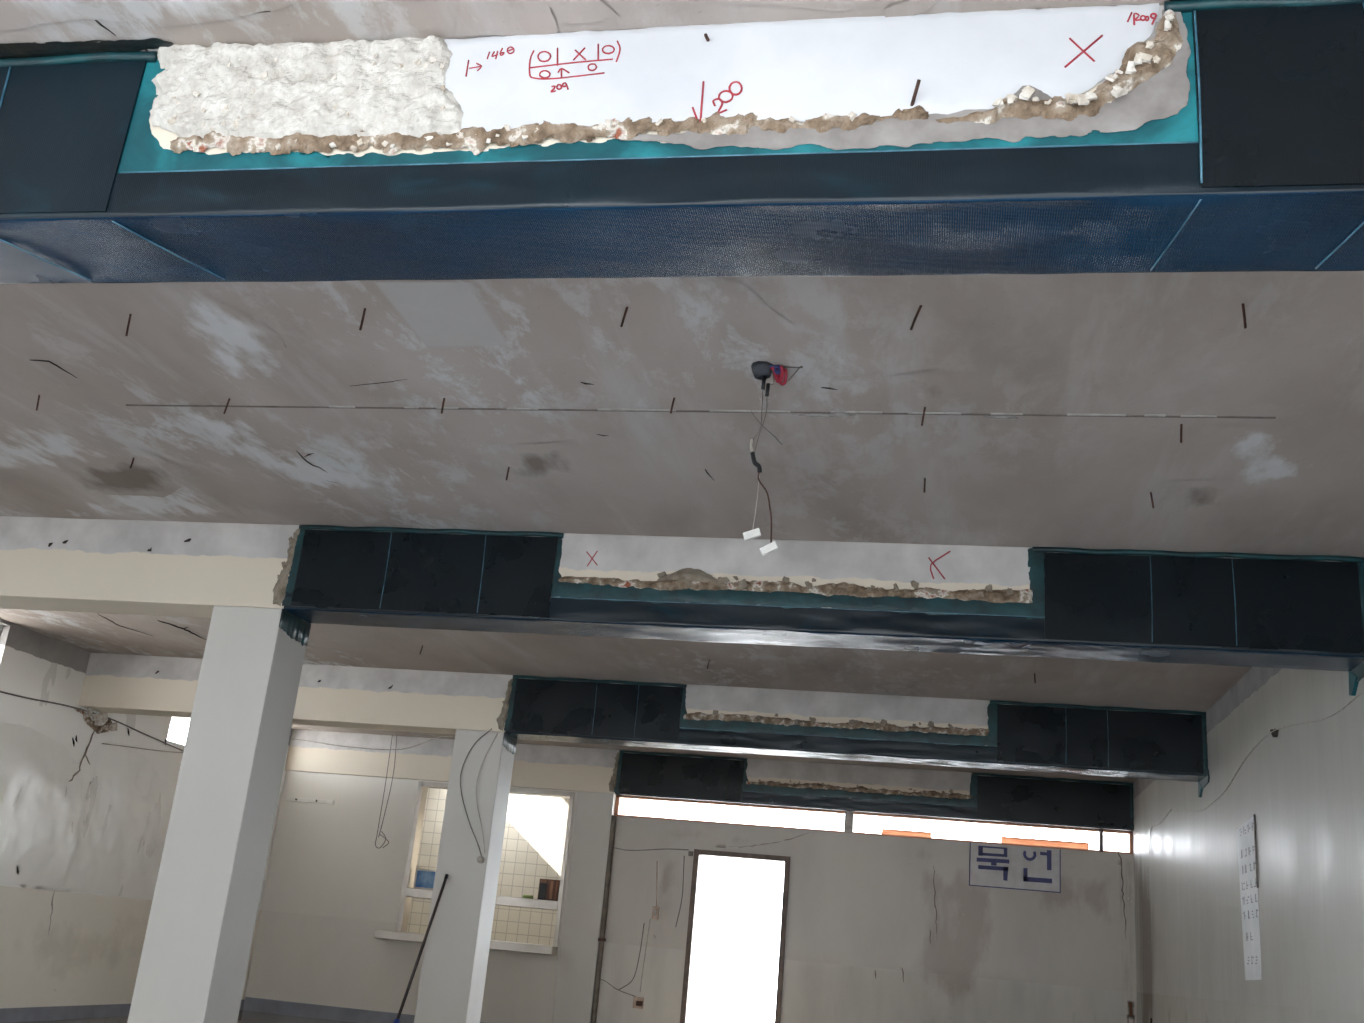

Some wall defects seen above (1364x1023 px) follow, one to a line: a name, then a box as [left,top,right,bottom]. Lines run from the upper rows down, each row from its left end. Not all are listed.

spalling [170,9,1183,156]
spalling [558,568,1033,603]
spalling [75,708,118,734]
spalling [683,710,989,736]
spalling [746,779,972,799]